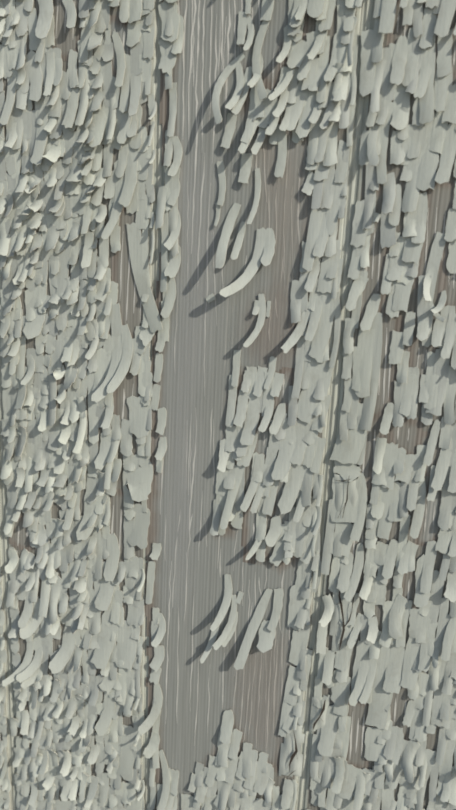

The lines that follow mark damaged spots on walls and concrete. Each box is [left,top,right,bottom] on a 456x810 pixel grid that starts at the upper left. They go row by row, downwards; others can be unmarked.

peeling [0,0,183,810]
peeling [145,0,456,810]